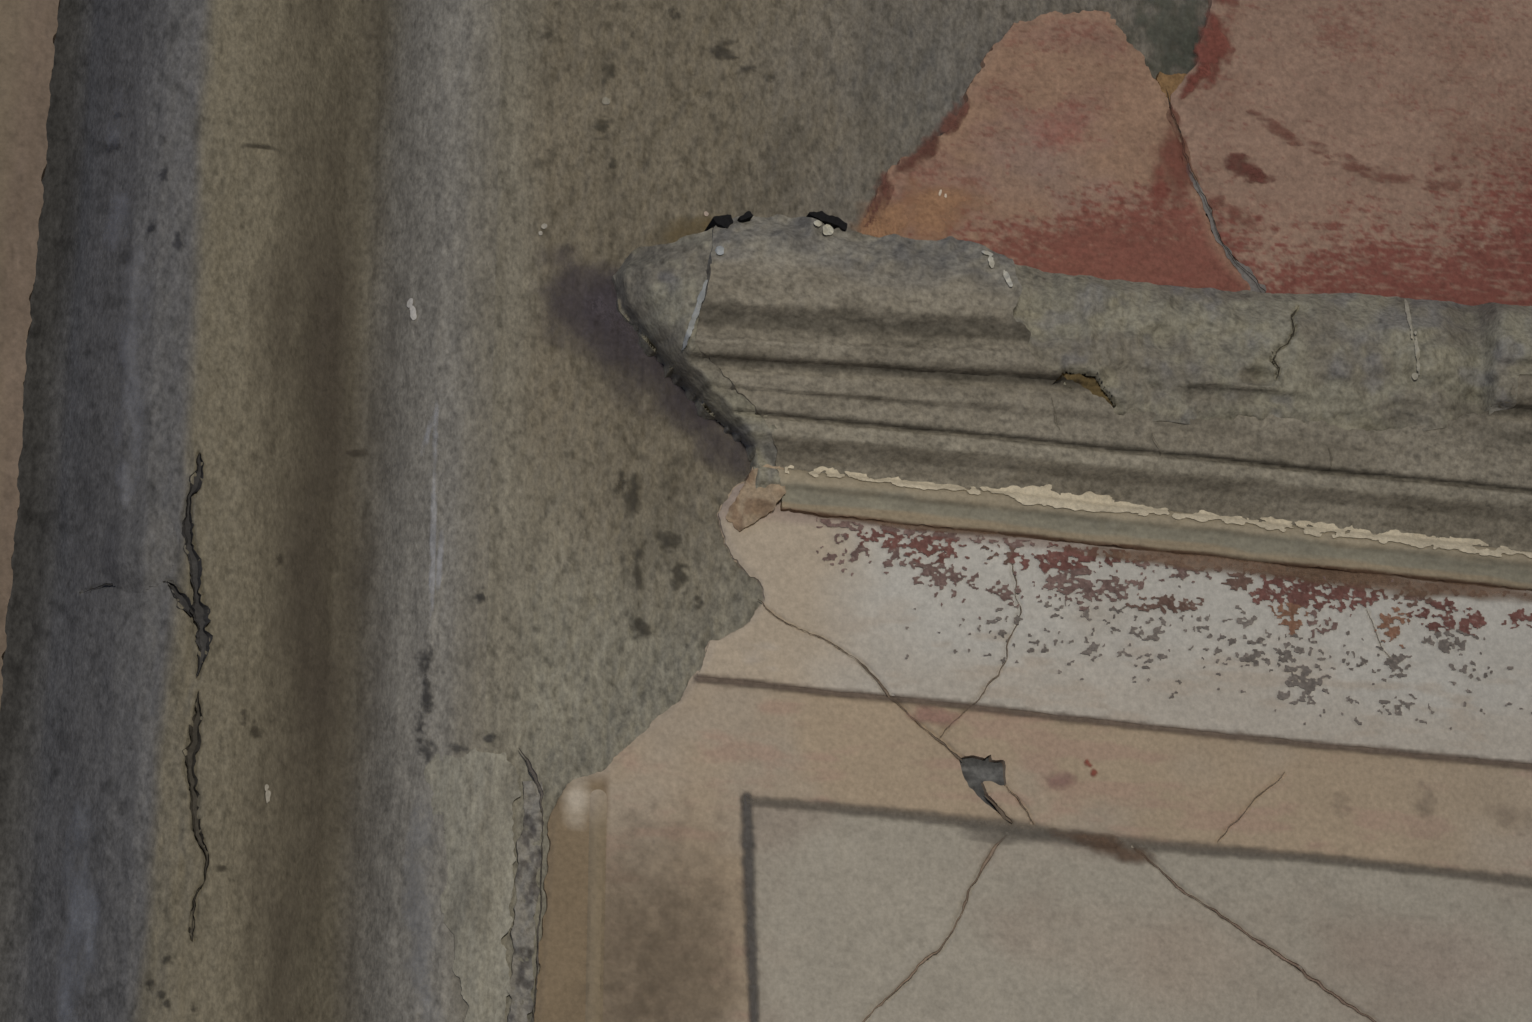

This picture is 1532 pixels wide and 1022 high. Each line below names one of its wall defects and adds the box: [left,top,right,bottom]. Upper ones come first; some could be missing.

peeling [1181,0,1237,98]
crack [1155,72,1298,378]
peeling [1226,153,1267,183]
spalling [612,228,1532,558]
crack [163,452,213,941]
spalling [632,618,651,635]
spalling [671,565,687,589]
crack [759,564,1022,761]
peeling [816,517,1532,725]
flaking render [418,655,544,1022]
crack [863,787,1034,1022]
crack [1135,848,1376,1022]